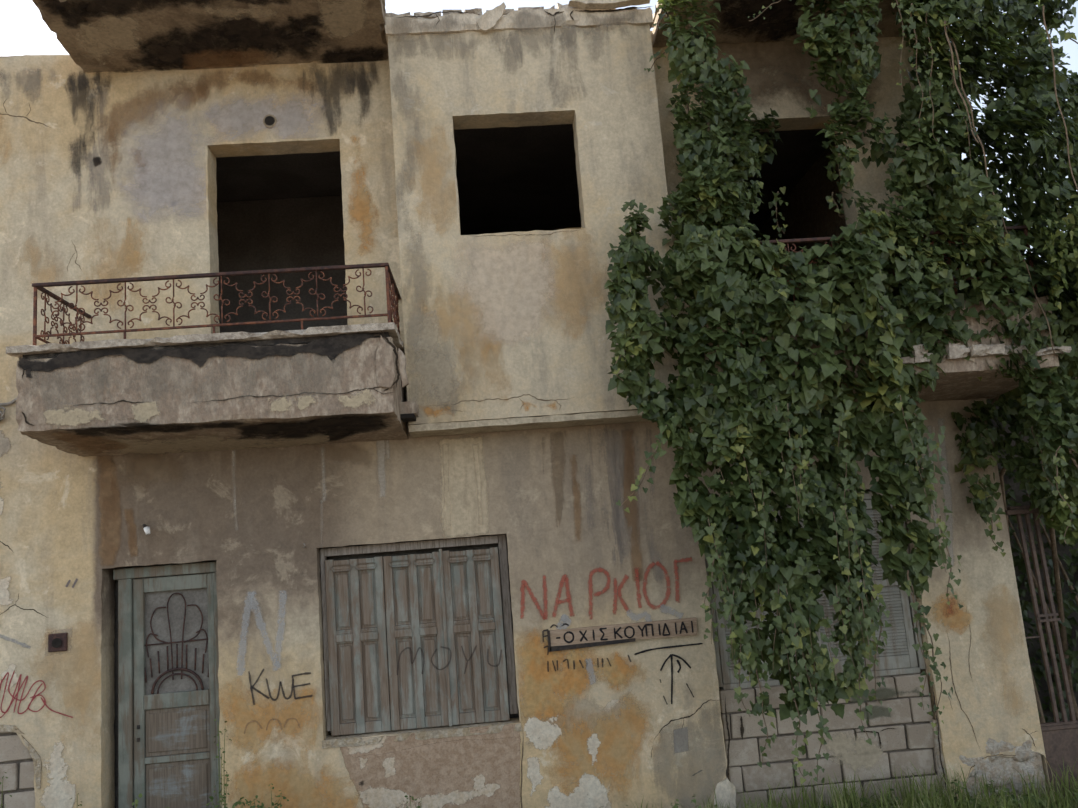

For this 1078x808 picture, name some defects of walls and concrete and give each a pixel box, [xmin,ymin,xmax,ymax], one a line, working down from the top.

peeling [477,2,506,33]
water stain [40,0,387,134]
crack [0,99,51,128]
water stain [73,142,84,170]
water stain [350,168,373,249]
peeling [43,406,105,426]
spalling [338,336,395,408]
crack [429,394,574,412]
crack [932,610,1036,787]
flaking render [0,725,75,808]
peeling [347,736,500,808]
peeling [524,715,612,808]